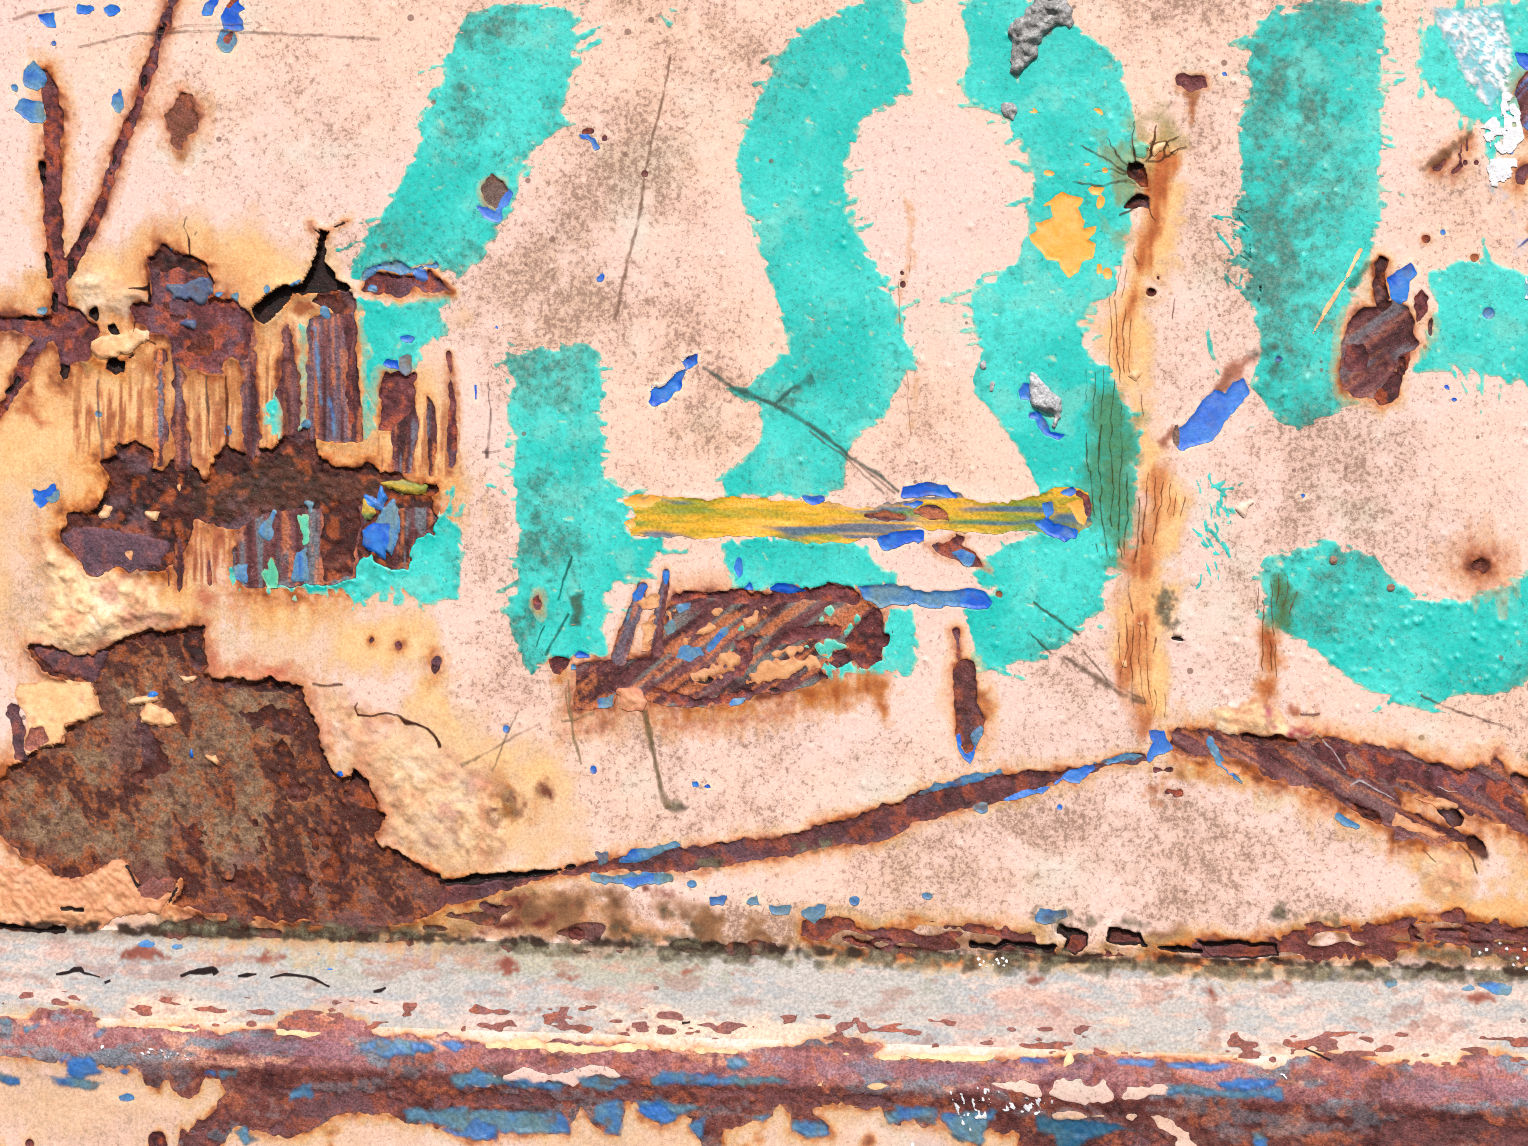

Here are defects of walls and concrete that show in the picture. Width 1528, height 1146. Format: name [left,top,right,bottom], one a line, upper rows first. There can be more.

rust [1512,158,1528,192]
peeling [32,483,60,508]
peeling [91,328,149,379]
spalling [252,218,457,324]
rust [0,0,793,975]
peeling [377,335,419,473]
rust [1086,129,1193,737]
rust [1334,252,1433,411]
spalling [429,625,1528,917]
peeling [138,940,183,949]
rust [794,853,1528,1004]
rust [0,991,1528,1146]